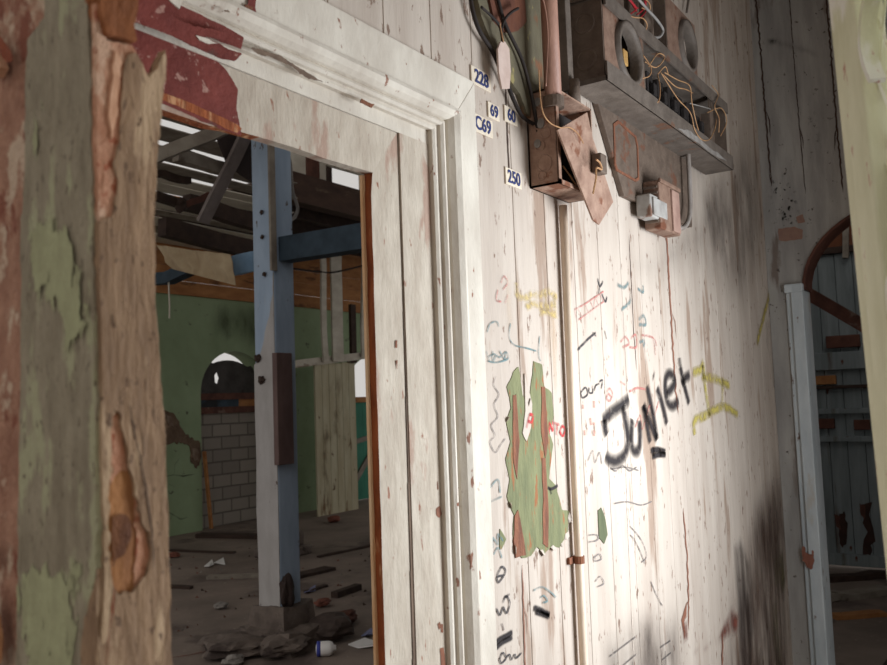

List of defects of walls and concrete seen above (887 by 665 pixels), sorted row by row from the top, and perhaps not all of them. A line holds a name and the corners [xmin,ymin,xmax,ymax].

peeling [91,0,328,222]
peeling [25,214,88,352]
peeling [17,560,83,665]
spalling [108,413,149,594]
spalling [164,410,201,469]
peeling [499,361,572,558]
water stain [738,497,786,665]